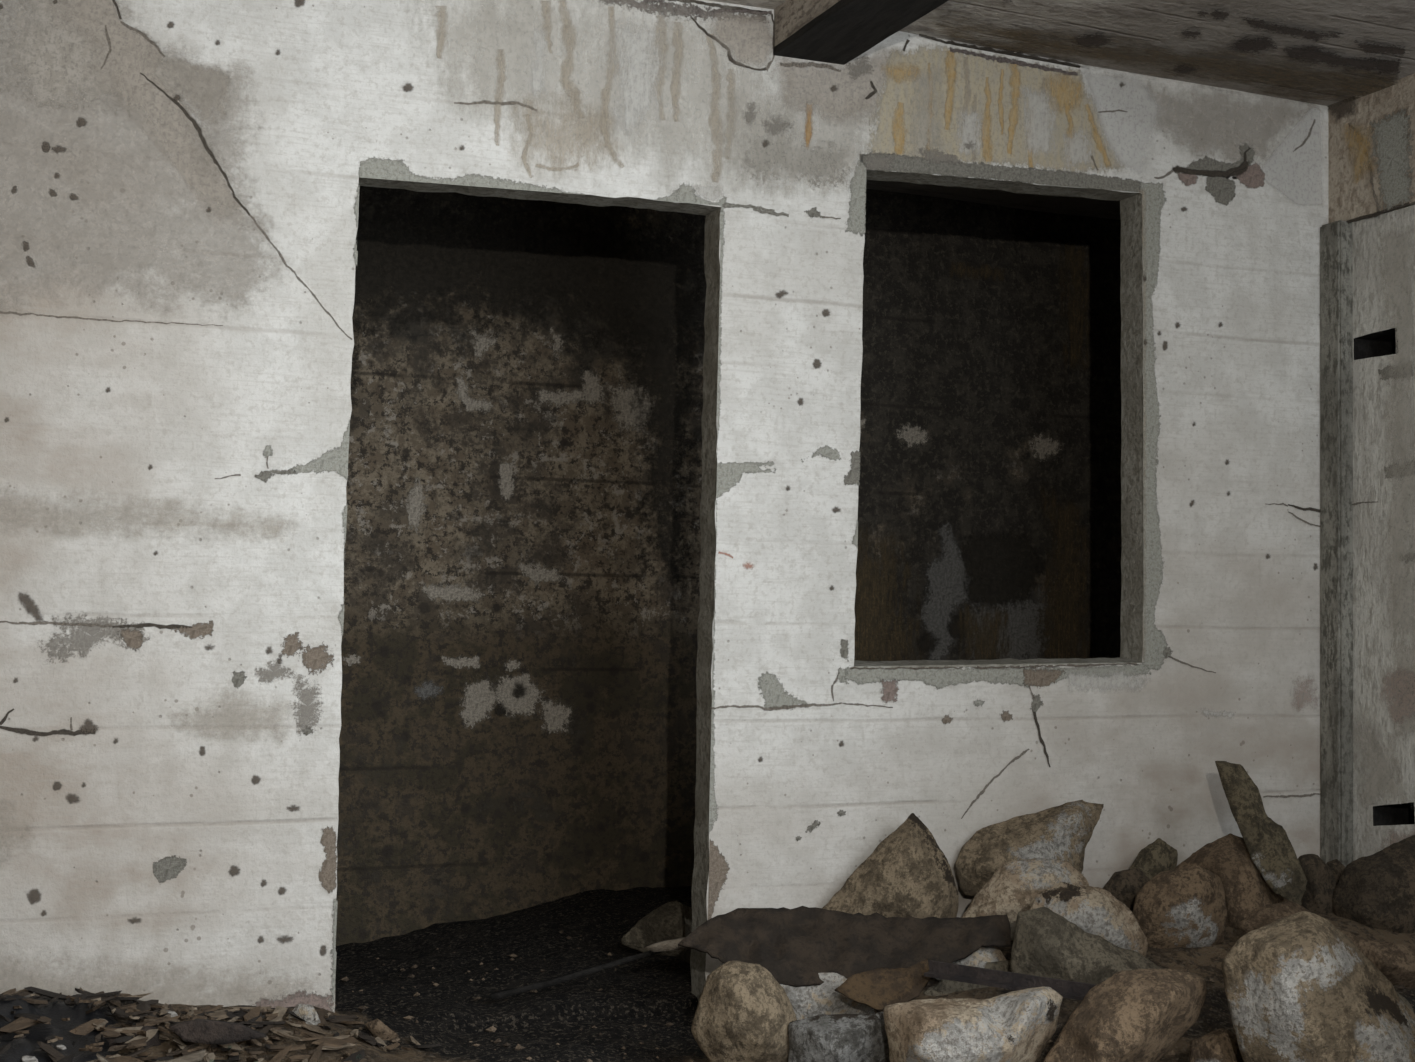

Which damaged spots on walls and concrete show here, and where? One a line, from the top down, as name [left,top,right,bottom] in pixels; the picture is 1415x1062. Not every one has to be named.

crack [101,25,112,69]
peeling [0,0,238,212]
leakage [454,0,682,175]
peeling [587,0,770,23]
corrosion [869,46,1124,172]
crack [140,73,352,340]
spalling [353,156,585,266]
leakage [0,311,223,326]
spalling [215,421,350,483]
spalling [656,34,1216,920]
spalling [0,593,214,663]
spalling [232,632,335,736]